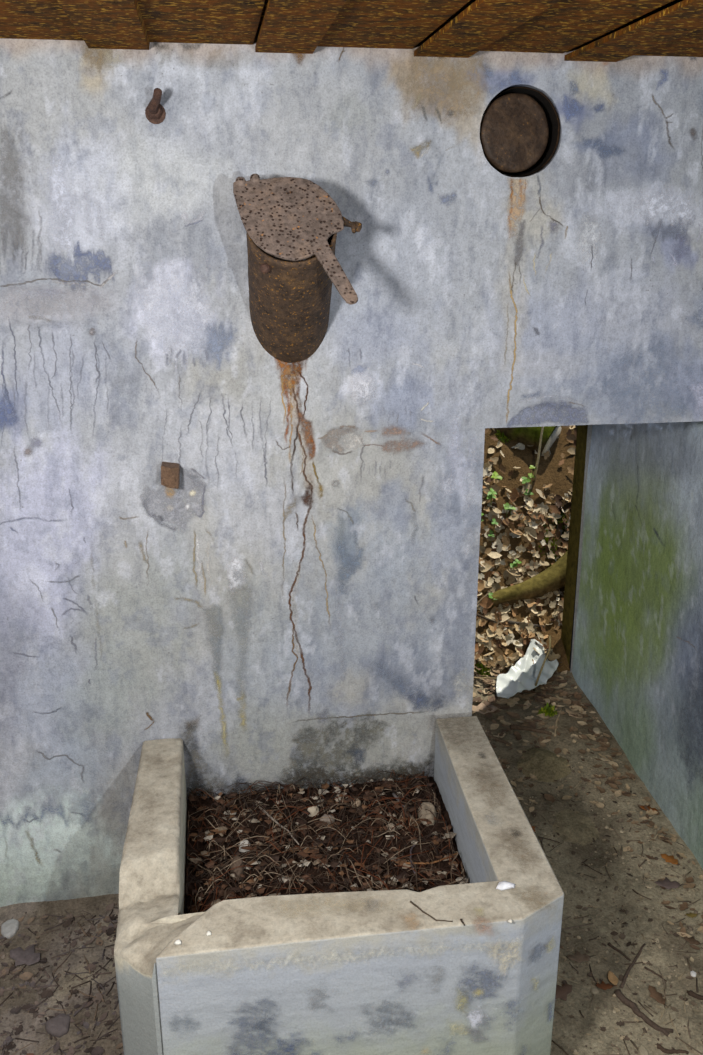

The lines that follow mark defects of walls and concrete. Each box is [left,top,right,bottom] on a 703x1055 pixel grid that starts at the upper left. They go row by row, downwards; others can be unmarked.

crack [652,96,672,146]
rust [508,179,526,230]
crack [135,342,180,388]
rust [506,290,518,415]
spalling [319,426,363,470]
spalling [143,468,205,529]
rust [275,358,330,698]
water stain [184,711,429,797]
water stain [458,944,517,1041]